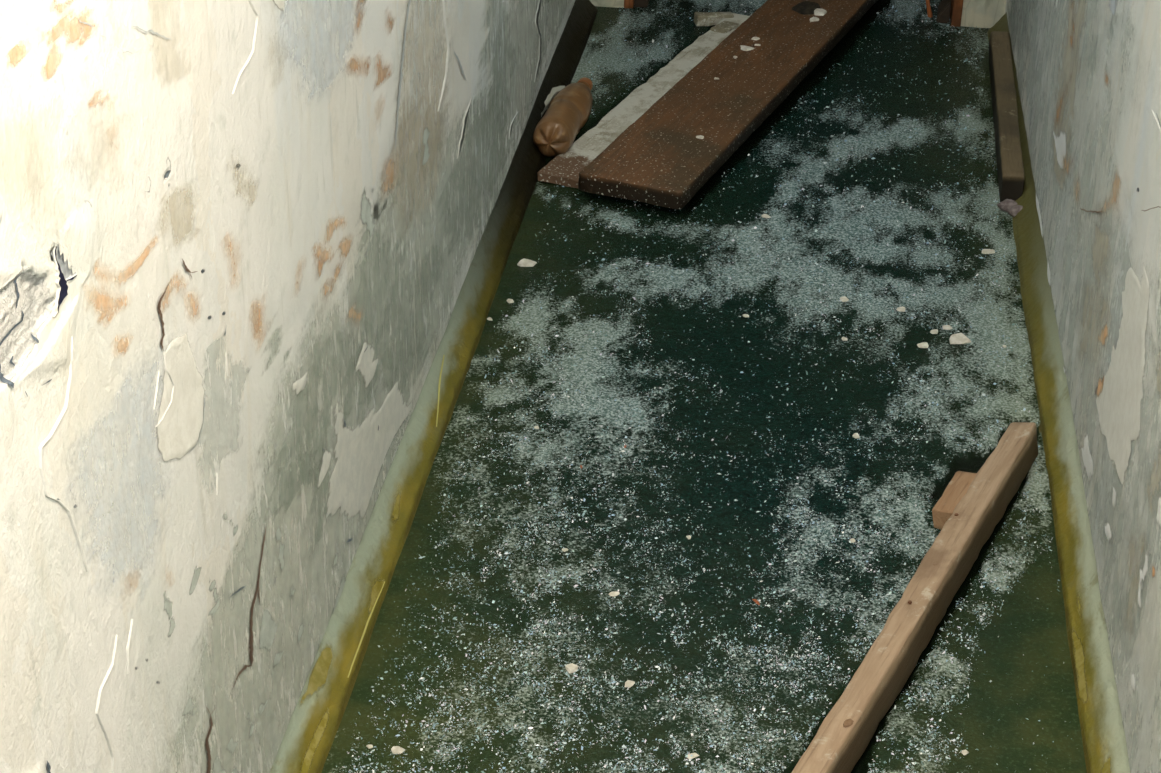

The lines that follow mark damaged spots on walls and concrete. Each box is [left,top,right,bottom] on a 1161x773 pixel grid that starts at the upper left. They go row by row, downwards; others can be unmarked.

rust [9,45,26,63]
rust [46,5,91,78]
spalling [51,243,76,279]
rust [119,243,155,280]
rust [317,219,350,294]
spalling [0,270,55,384]
water stain [188,0,565,773]
peeling [1095,263,1150,507]
peeling [1082,434,1093,479]
peeling [1138,551,1150,607]